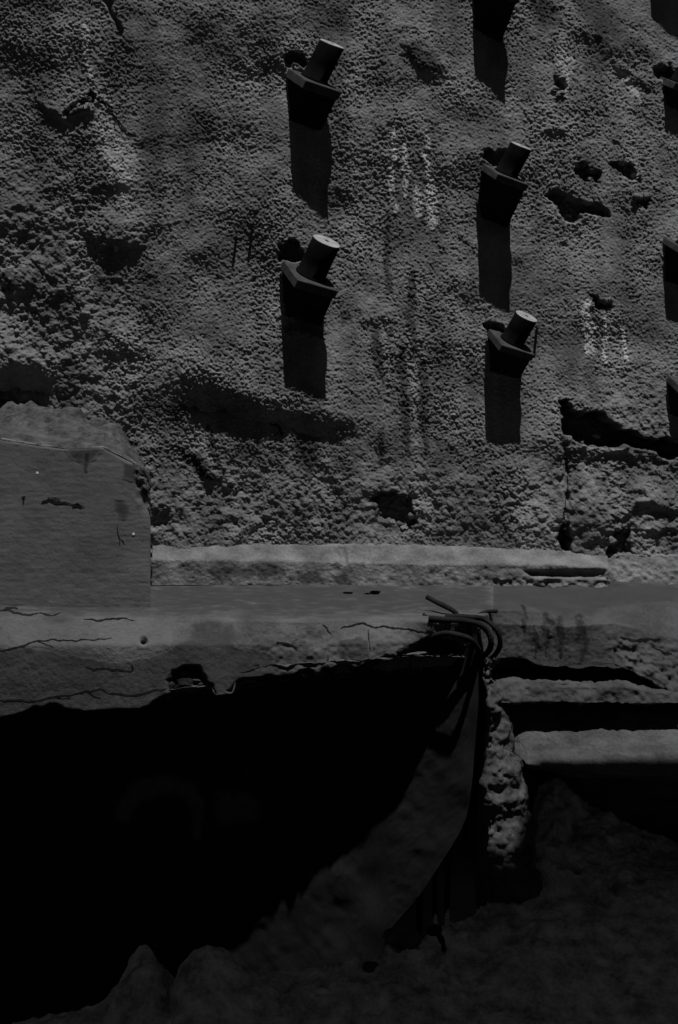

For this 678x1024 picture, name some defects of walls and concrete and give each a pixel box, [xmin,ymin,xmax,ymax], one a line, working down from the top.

spalling [573,159,644,183]
spalling [543,190,610,222]
water stain [368,124,441,470]
water stain [579,297,629,366]
spalling [558,399,678,460]
crack [560,435,569,518]
crack [0,607,134,651]
crack [322,622,428,671]
spalling [0,633,482,1024]